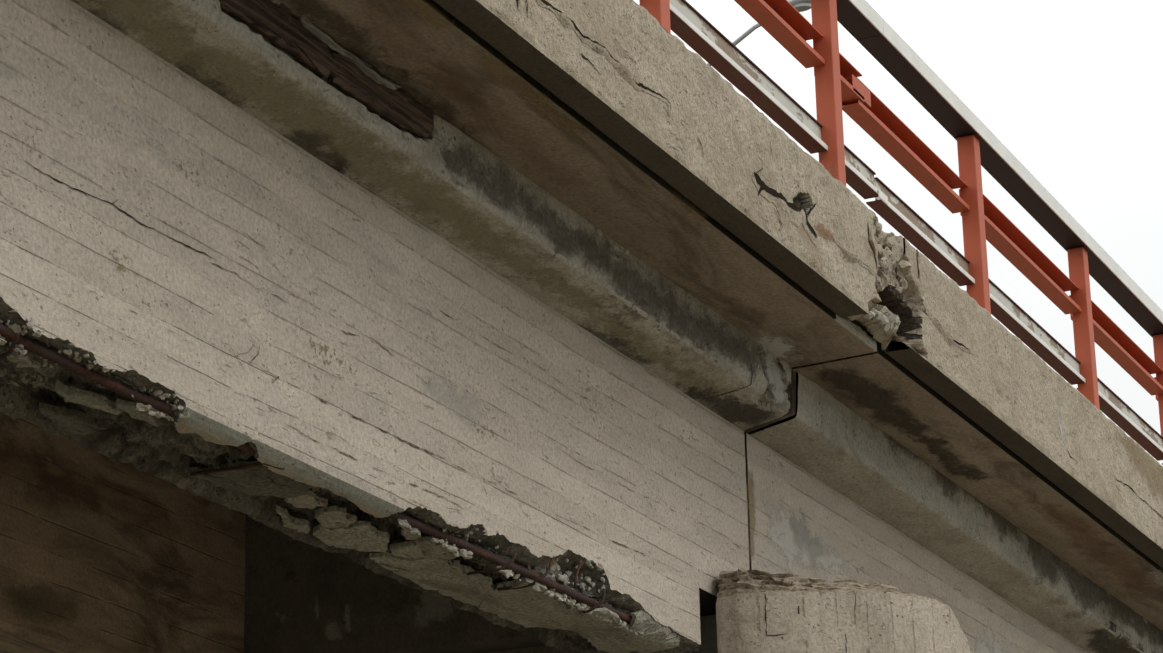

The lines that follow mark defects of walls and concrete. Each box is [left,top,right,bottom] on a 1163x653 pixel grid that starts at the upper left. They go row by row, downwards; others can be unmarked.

crack [517,0,671,114]
crack [24,160,427,384]
crack [752,141,877,276]
spalling [834,213,928,358]
spalling [0,296,701,653]
leakage [684,336,799,431]
leakage [820,369,988,480]
leakage [1059,568,1163,653]